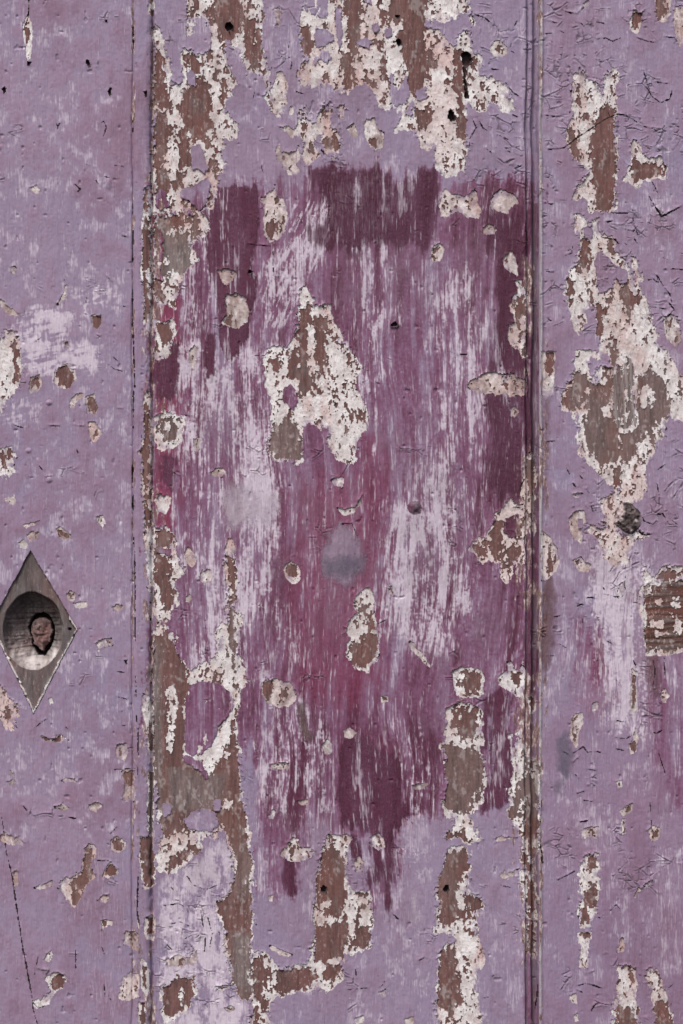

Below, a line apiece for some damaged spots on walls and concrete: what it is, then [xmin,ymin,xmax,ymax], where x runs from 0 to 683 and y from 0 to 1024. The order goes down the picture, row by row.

crack [469,12,674,167]
peeling [140,0,519,361]
crack [602,182,680,244]
peeling [0,329,102,443]
peeling [262,286,369,489]
peeling [467,67,683,584]
peeling [115,390,375,1024]
peeling [345,587,381,673]
peeling [636,564,683,656]
peeling [432,661,542,1024]
peeling [611,937,674,1024]